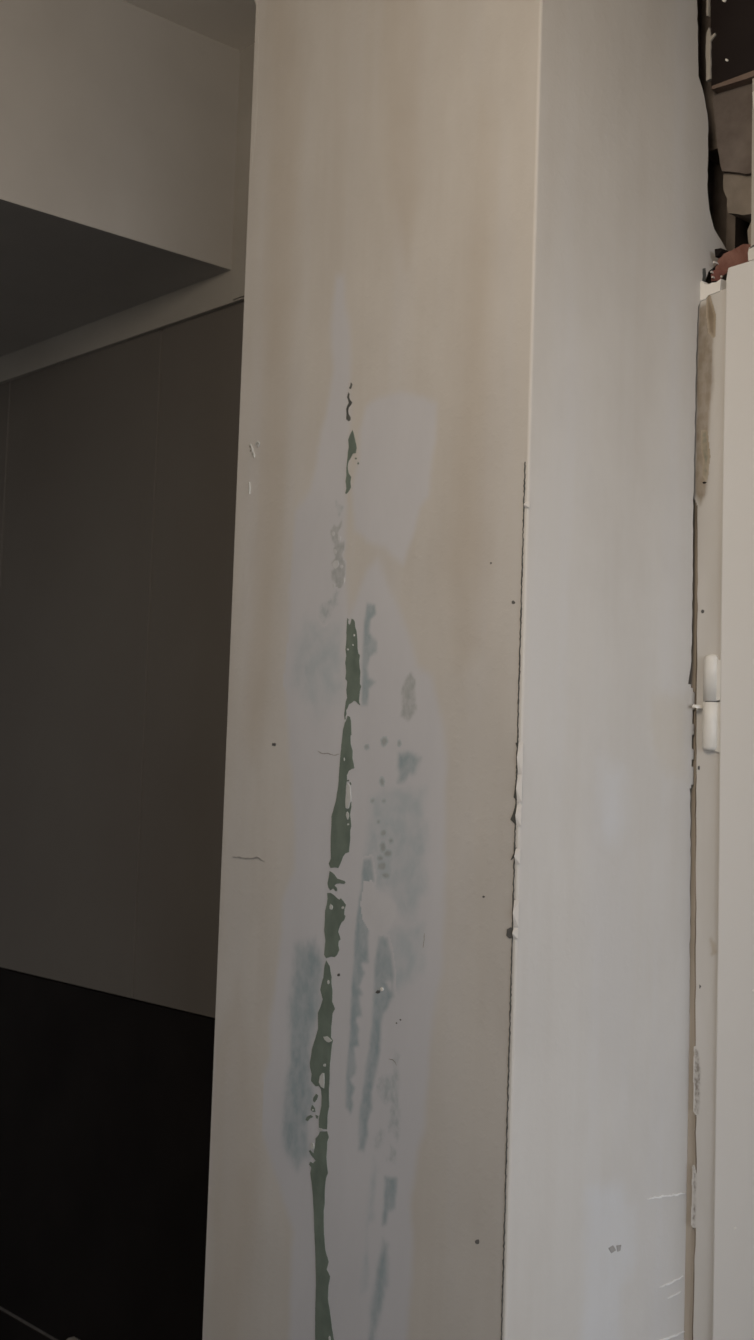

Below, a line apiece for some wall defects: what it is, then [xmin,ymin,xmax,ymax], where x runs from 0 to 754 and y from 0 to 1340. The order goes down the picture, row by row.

peeling [345,430,359,494]
peeling [306,618,402,1340]